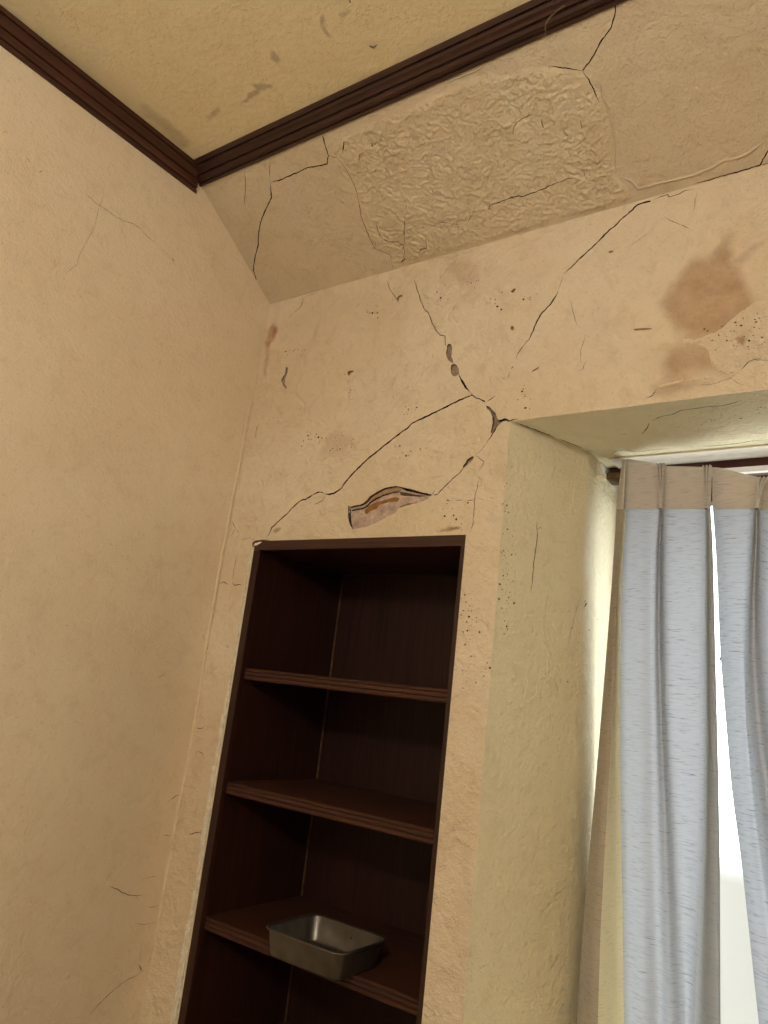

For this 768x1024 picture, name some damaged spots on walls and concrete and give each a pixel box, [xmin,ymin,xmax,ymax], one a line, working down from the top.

crack [552,6,616,101]
crack [439,95,585,235]
crack [220,136,768,586]
spalling [348,486,434,529]